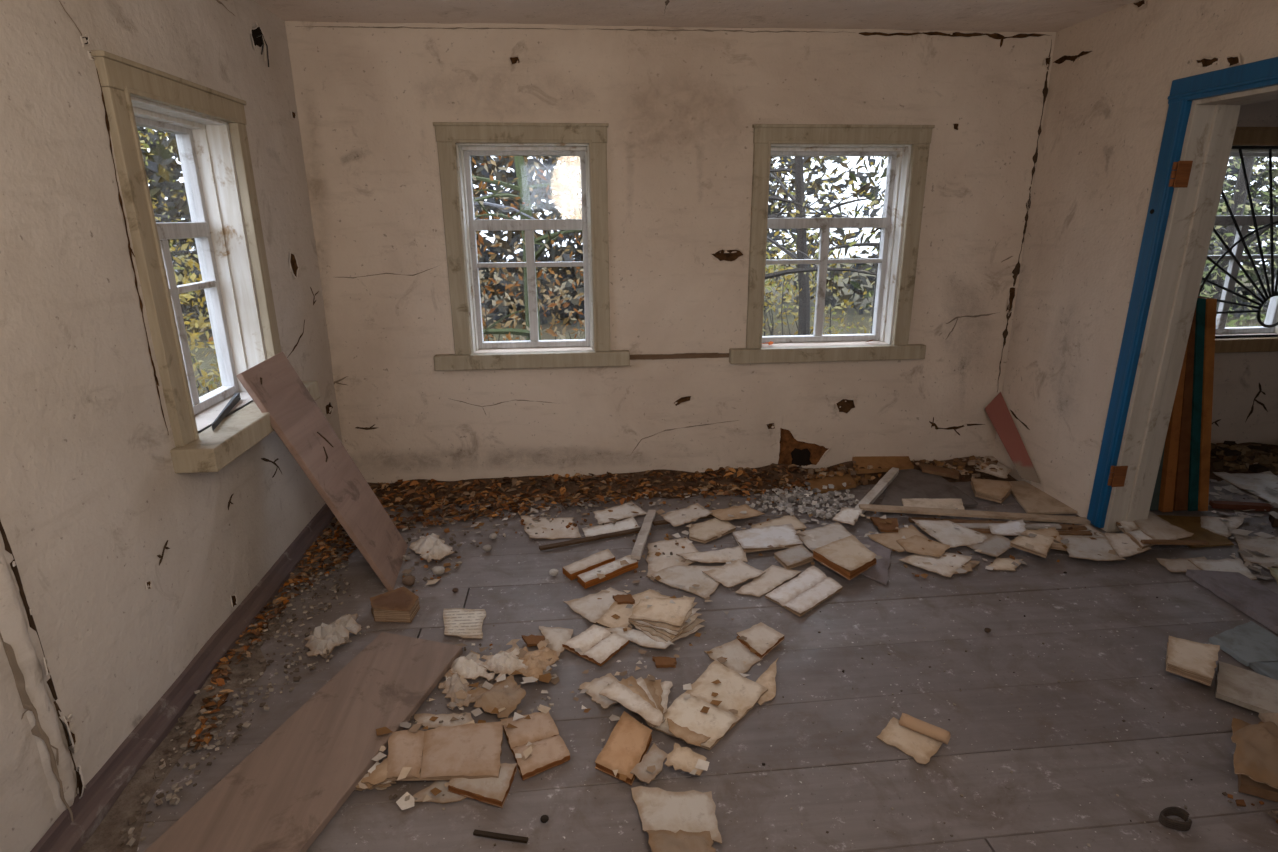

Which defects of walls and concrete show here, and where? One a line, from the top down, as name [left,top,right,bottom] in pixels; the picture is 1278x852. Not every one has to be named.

flaking render [710,247,745,265]
crack [601,0,1092,435]
spalling [766,422,832,468]
crack [0,520,81,821]